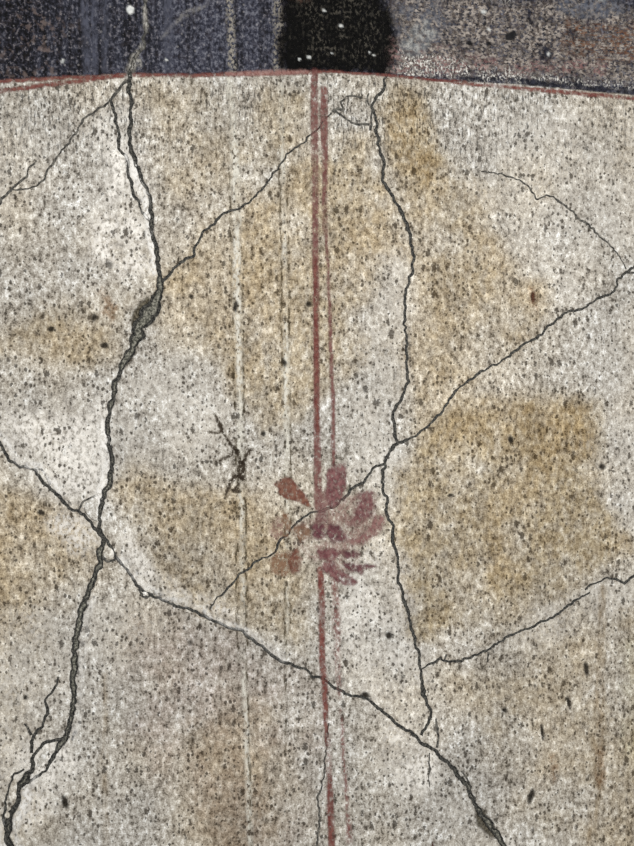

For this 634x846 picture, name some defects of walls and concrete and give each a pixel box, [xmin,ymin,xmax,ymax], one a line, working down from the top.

leakage [233,211,243,415]
crack [0,0,507,846]
crack [209,67,634,736]
leakage [124,535,153,576]
leakage [346,581,383,649]
leakage [242,671,252,846]